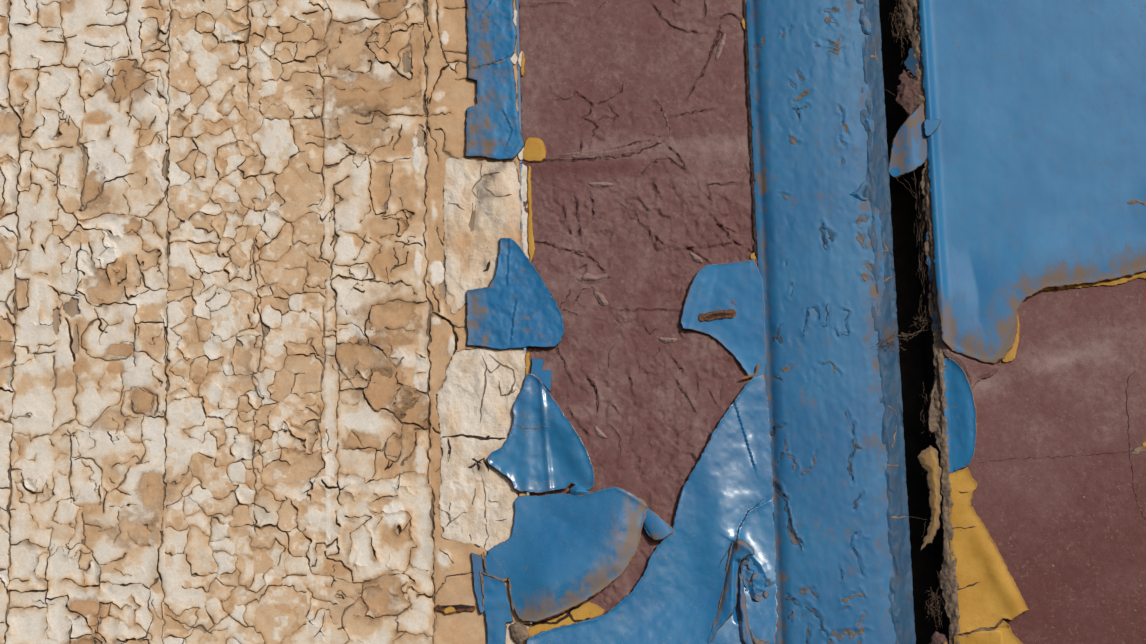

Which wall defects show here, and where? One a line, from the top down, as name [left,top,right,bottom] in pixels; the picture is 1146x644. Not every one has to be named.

crack [243,0,251,110]
crack [0,0,212,644]
crack [251,239,265,532]
peeling [0,0,800,644]
peeling [917,358,977,551]